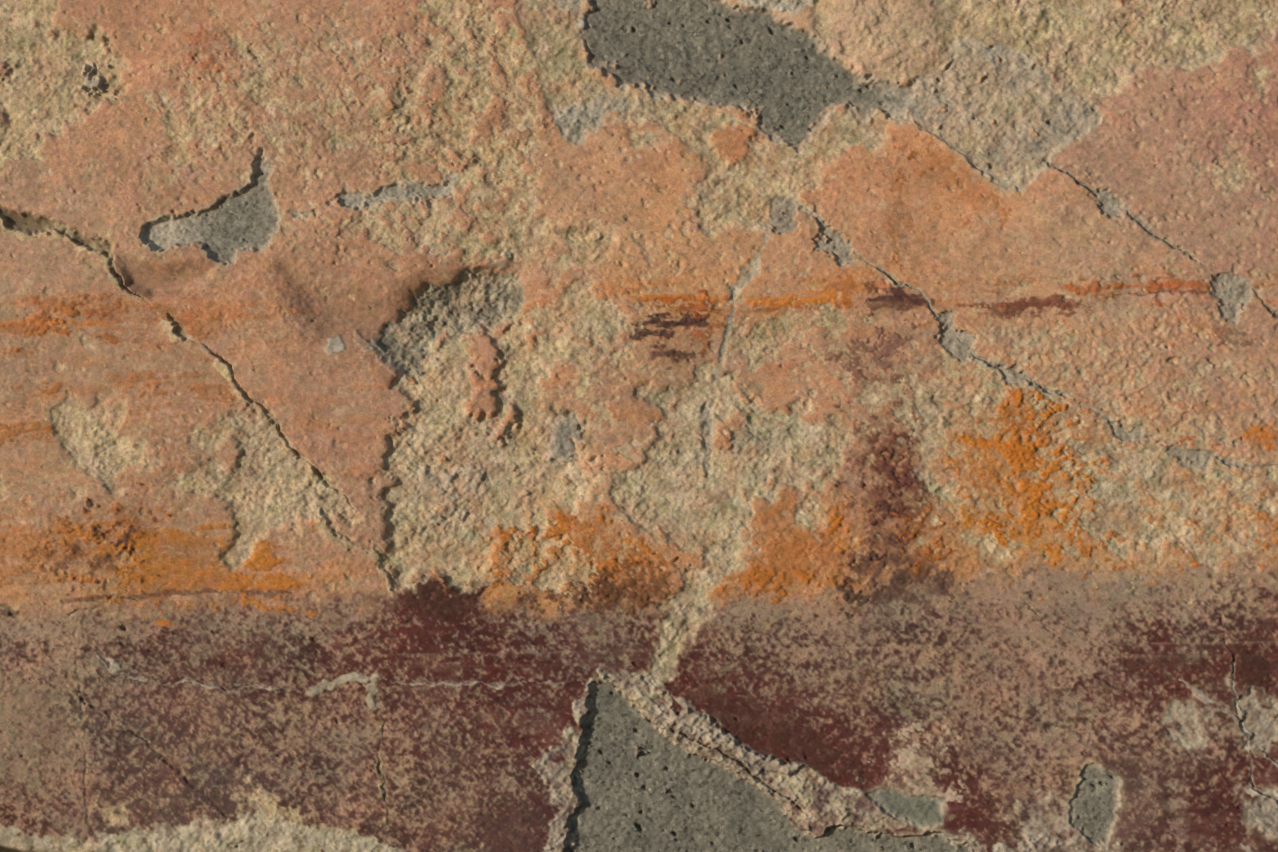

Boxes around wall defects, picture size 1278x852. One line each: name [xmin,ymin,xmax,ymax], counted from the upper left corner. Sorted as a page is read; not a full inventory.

spalling [0,0,140,179]
spalling [808,0,1278,107]
crack [1044,160,1278,324]
rust [0,294,240,397]
rust [0,478,319,630]
crack [0,204,398,598]
rust [485,505,682,635]
spalling [134,0,1053,852]
rust [714,485,856,606]
crack [695,196,1278,496]
spalling [1029,408,1278,589]
spalling [931,790,1123,852]